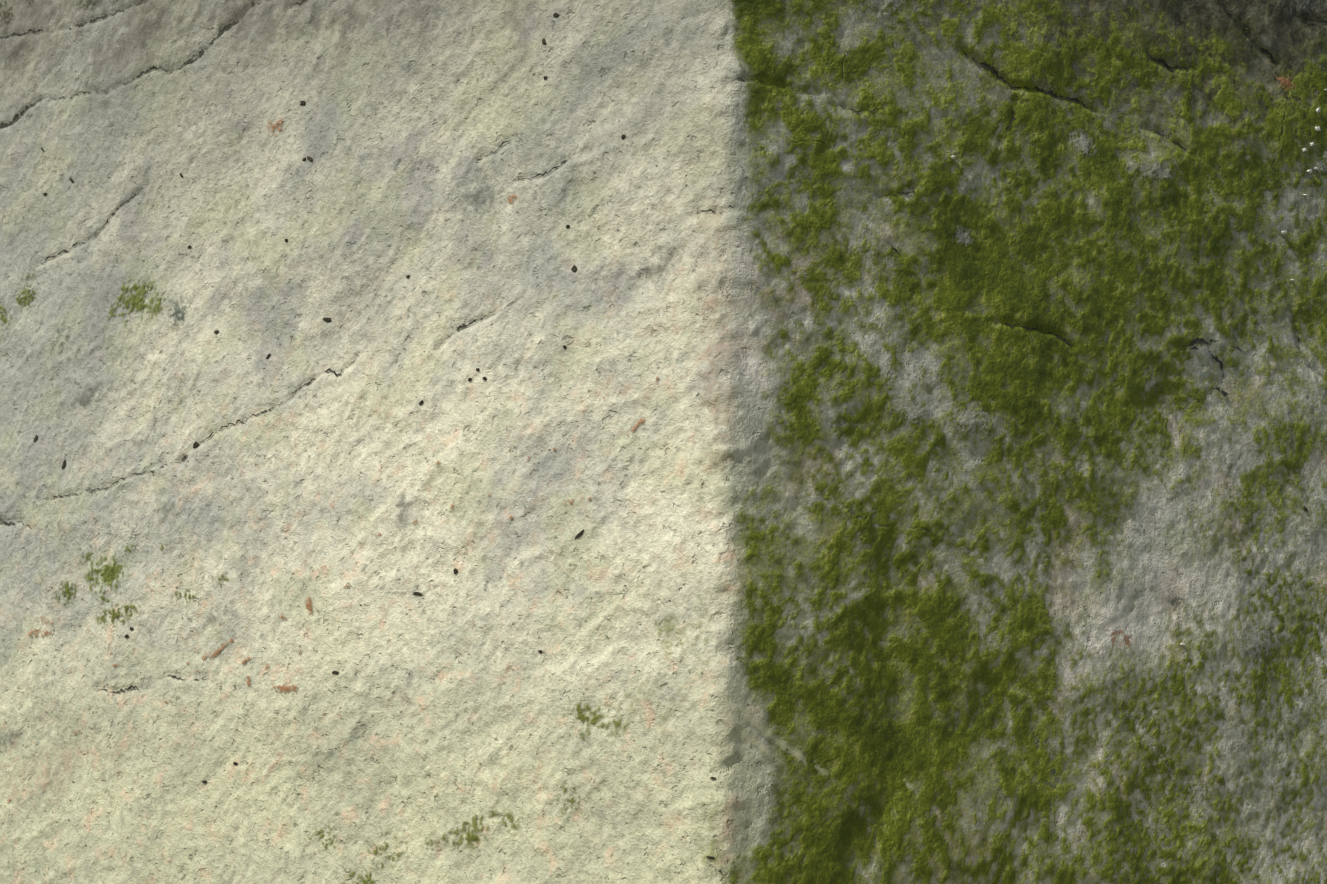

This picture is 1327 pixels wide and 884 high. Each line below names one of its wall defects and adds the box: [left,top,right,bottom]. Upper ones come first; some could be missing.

crack [0,0,306,128]
crack [960,48,1092,142]
leakage [923,0,1327,152]
crack [1218,0,1275,62]
crack [32,190,143,268]
crack [438,296,521,348]
leakage [1182,337,1229,397]
crack [0,359,356,529]